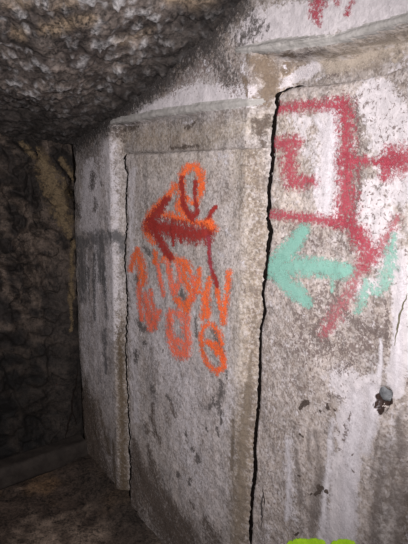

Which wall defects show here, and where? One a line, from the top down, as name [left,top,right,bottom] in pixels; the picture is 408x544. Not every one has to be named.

crack [124,154,137,512]
crack [248,85,304,544]
damp [284,439,299,521]
damp [311,419,334,540]
damp [338,384,377,541]